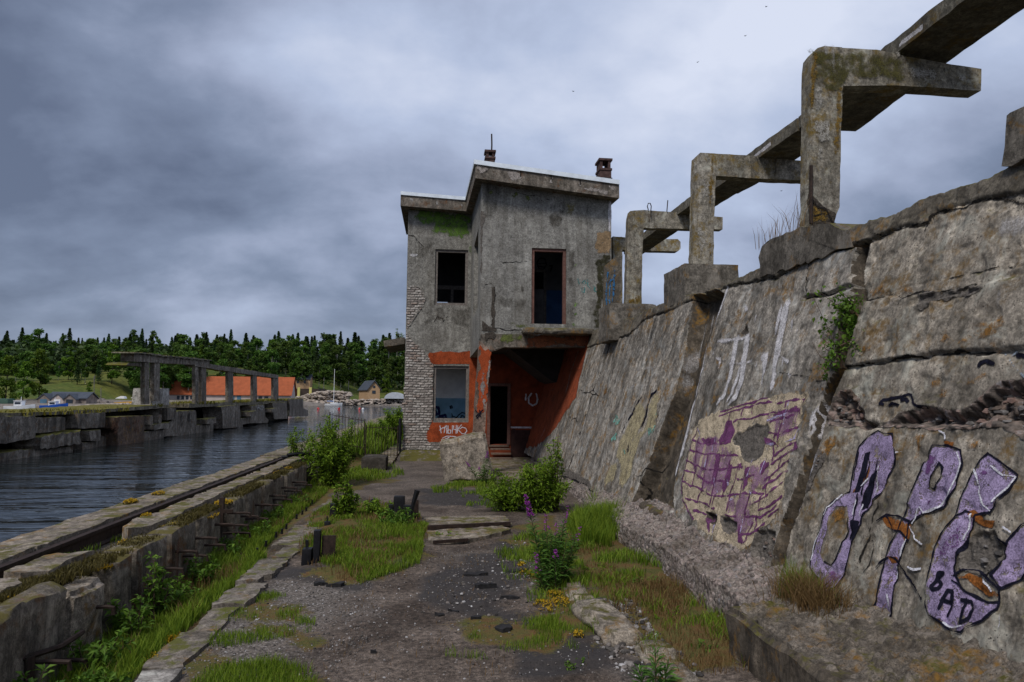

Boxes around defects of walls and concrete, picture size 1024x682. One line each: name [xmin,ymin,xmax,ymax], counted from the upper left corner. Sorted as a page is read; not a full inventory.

crack [840,197,1024,251]
flaking render [402,286,440,450]
crack [569,299,711,467]
crack [846,349,996,368]
spalling [826,379,1024,440]